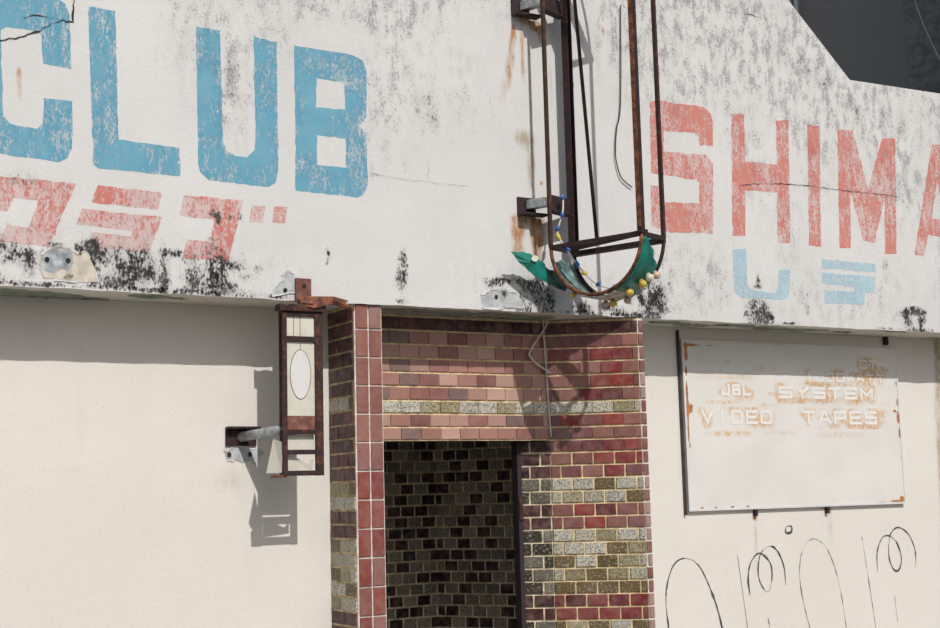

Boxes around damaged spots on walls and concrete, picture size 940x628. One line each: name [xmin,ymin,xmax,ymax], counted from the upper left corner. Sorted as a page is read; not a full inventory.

crack [0,0,75,41]
corrosion [513,216,544,251]
water stain [0,241,73,288]
spalling [0,244,109,301]
water stain [75,237,258,297]
water stain [396,251,408,303]
water stain [486,277,556,313]
water stain [567,282,671,319]
water stain [743,299,795,325]
water stain [899,306,940,359]